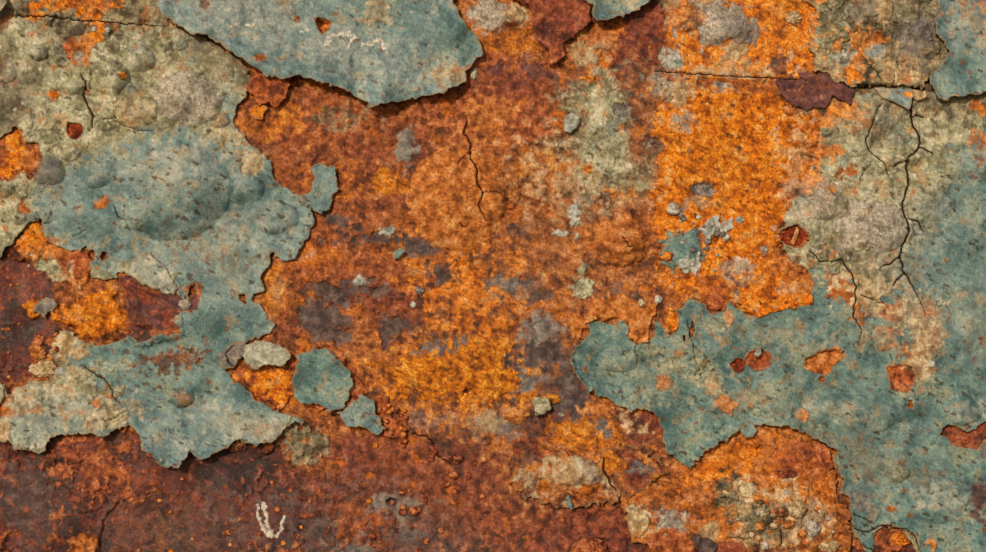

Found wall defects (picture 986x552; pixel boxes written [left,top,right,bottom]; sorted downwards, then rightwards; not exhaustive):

corrosion [517,0,592,65]
corrosion [246,73,291,120]
corrosion [8,221,199,347]
peeling [0,0,483,468]
crack [457,121,503,227]
corrosion [563,0,949,344]
peeling [570,0,986,552]
crack [809,105,934,345]
corrosion [230,328,526,449]
corrosion [0,428,160,552]
corrosion [230,421,376,552]
corrosion [508,428,853,552]